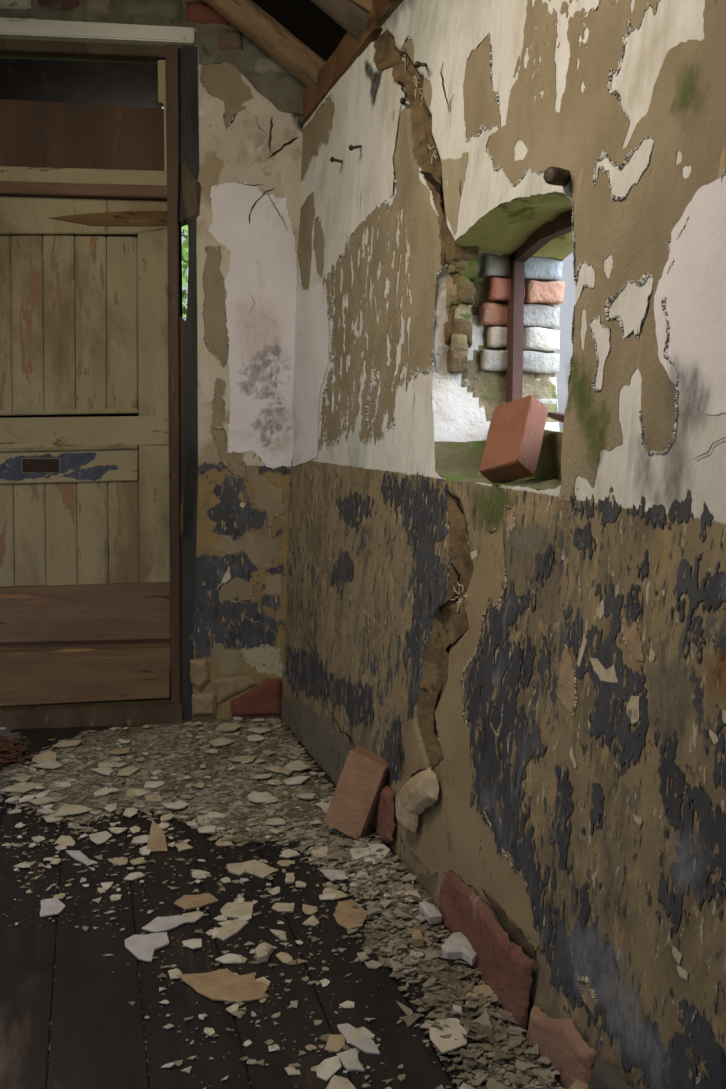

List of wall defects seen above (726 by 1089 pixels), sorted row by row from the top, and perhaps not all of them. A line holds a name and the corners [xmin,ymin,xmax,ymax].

crack [255,116,298,158]
crack [373,30,461,266]
crack [238,182,288,231]
peeling [296,0,726,663]
peeling [189,244,373,727]
crack [398,495,474,777]
crack [329,710,355,745]
flaking render [335,471,726,1089]
peeling [226,859,295,884]
peeling [272,903,295,913]
peeling [255,929,287,963]
peeling [326,1048,365,1089]